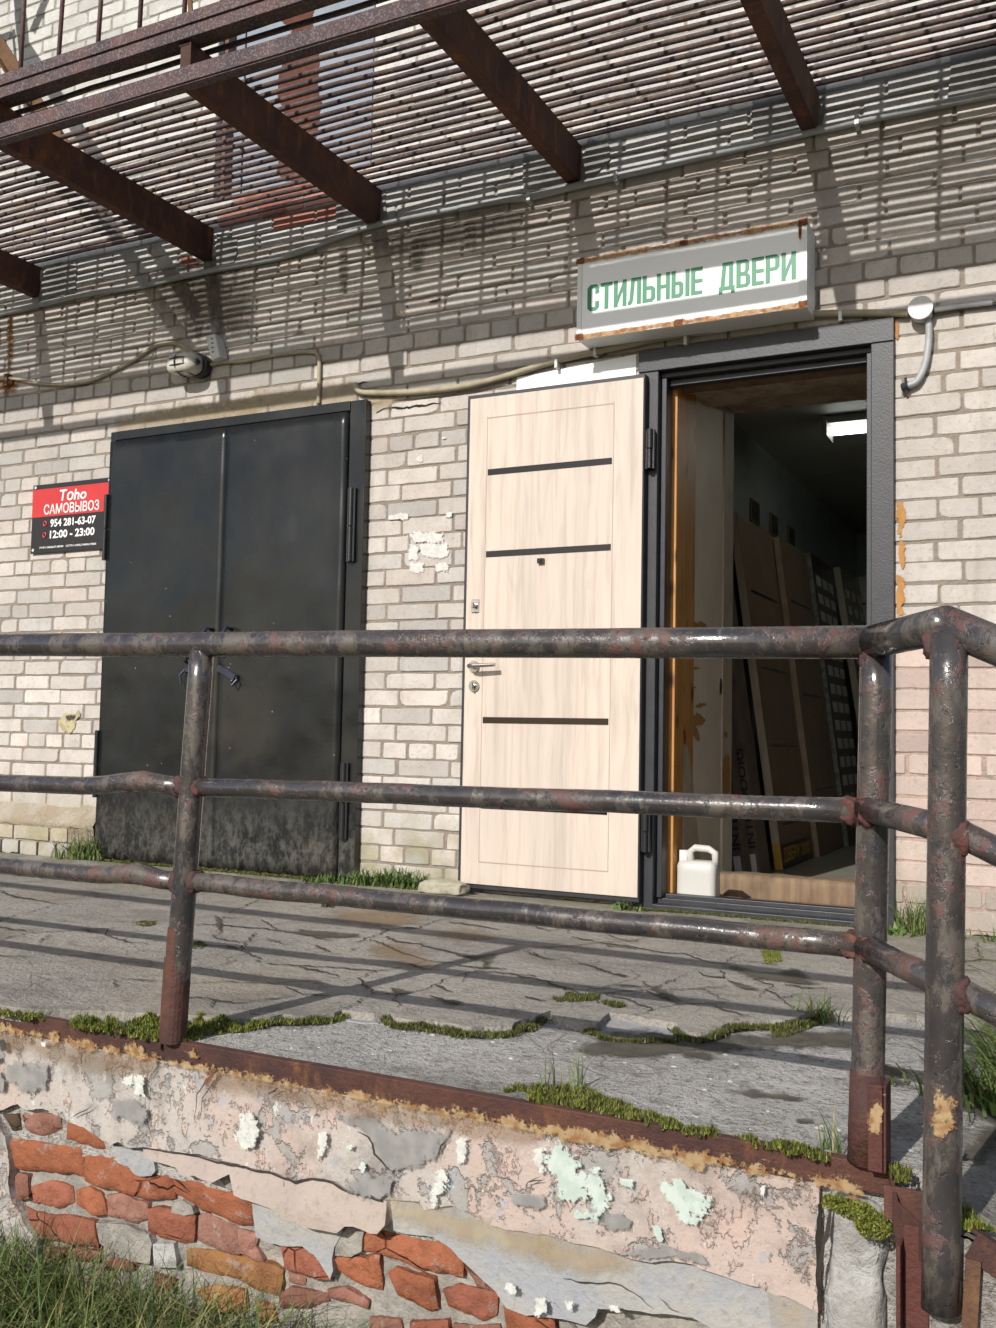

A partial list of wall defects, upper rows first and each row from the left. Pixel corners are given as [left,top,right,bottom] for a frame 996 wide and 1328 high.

rust [576,217,808,264]
rust [575,300,808,341]
crack [0,851,150,956]
crack [189,899,825,1016]
crack [965,934,996,970]
flaking render [0,1041,49,1094]
flaking render [111,1073,148,1128]
spalling [732,1089,802,1101]
flaking render [3,1109,820,1328]
crack [815,1204,832,1321]